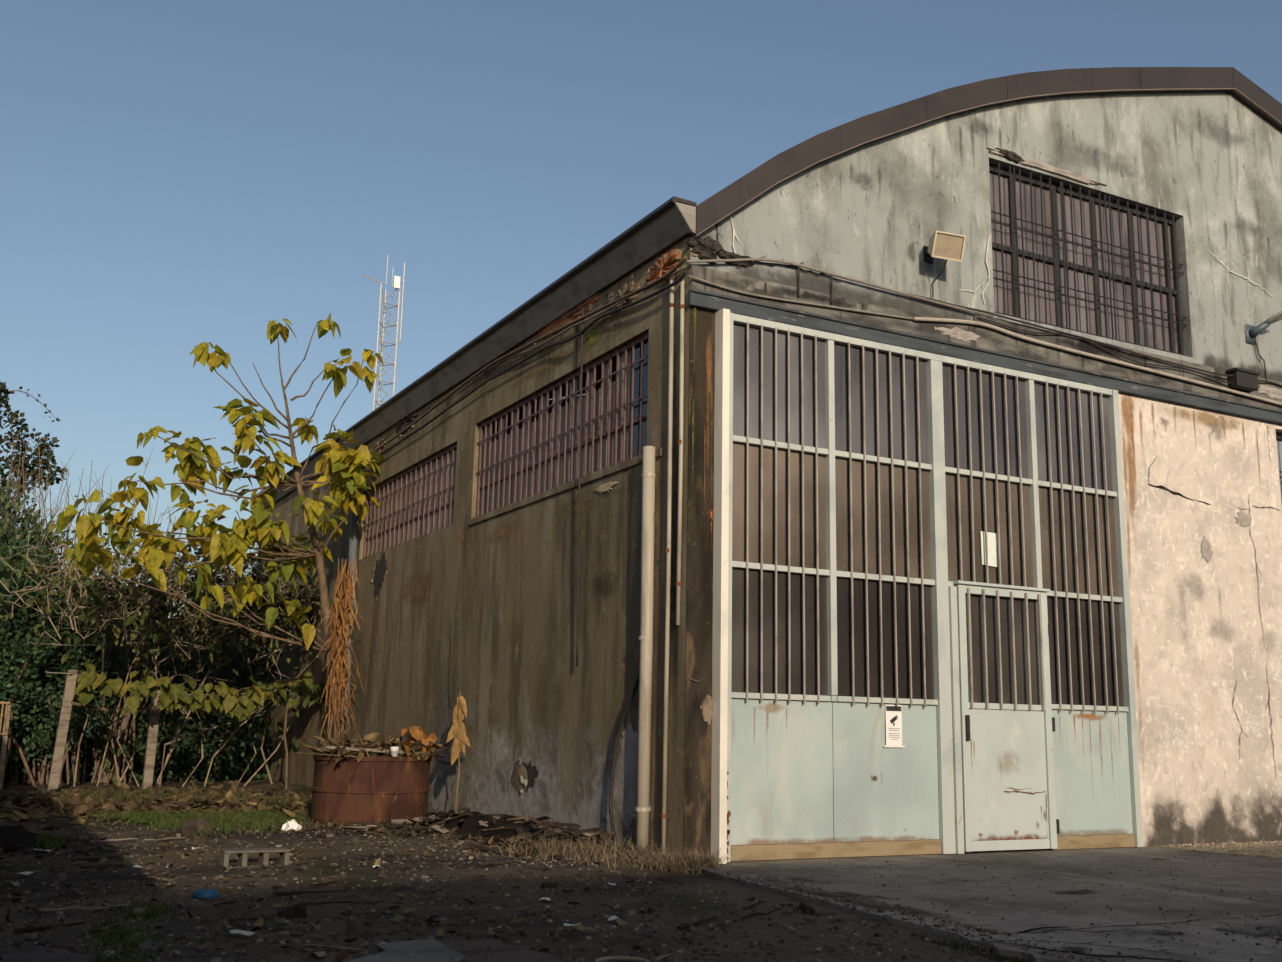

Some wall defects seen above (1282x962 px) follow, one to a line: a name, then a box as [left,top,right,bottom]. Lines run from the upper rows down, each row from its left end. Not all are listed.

water stain [739,268,974,326]
water stain [1065,340,1149,367]
crack [1149,456,1279,647]
crack [1233,680,1276,768]
water stain [1147,802,1282,846]
crack [922,857,1281,962]